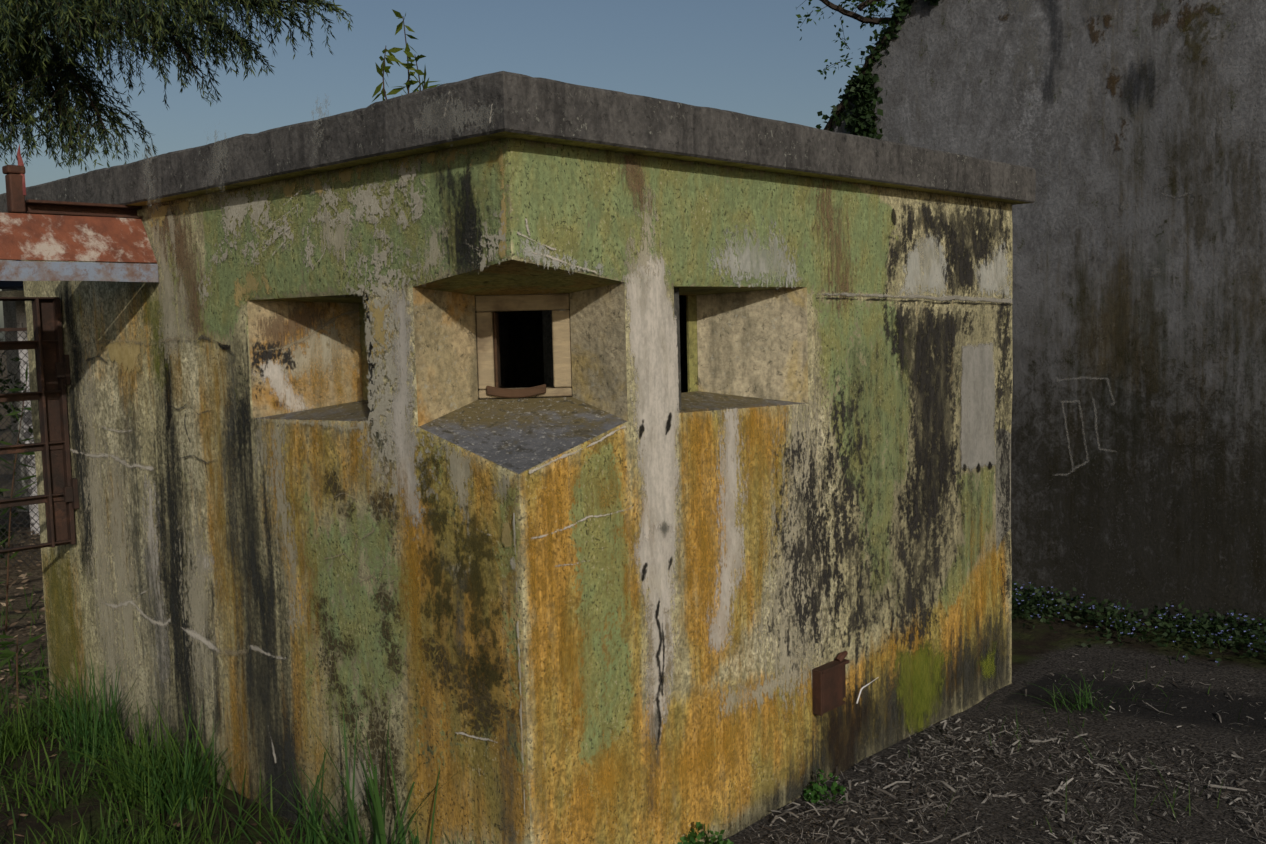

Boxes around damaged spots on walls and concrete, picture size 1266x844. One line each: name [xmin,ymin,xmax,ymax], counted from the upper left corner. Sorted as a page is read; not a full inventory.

damp [436,164,489,273]
peeling [470,147,507,271]
damp [517,238,603,275]
peeling [101,161,448,555]
crack [70,426,154,471]
crack [102,591,286,668]
damp [43,286,347,844]
damp [419,443,507,693]
crack [648,601,672,750]
damp [707,408,748,653]
damp [709,198,1012,804]